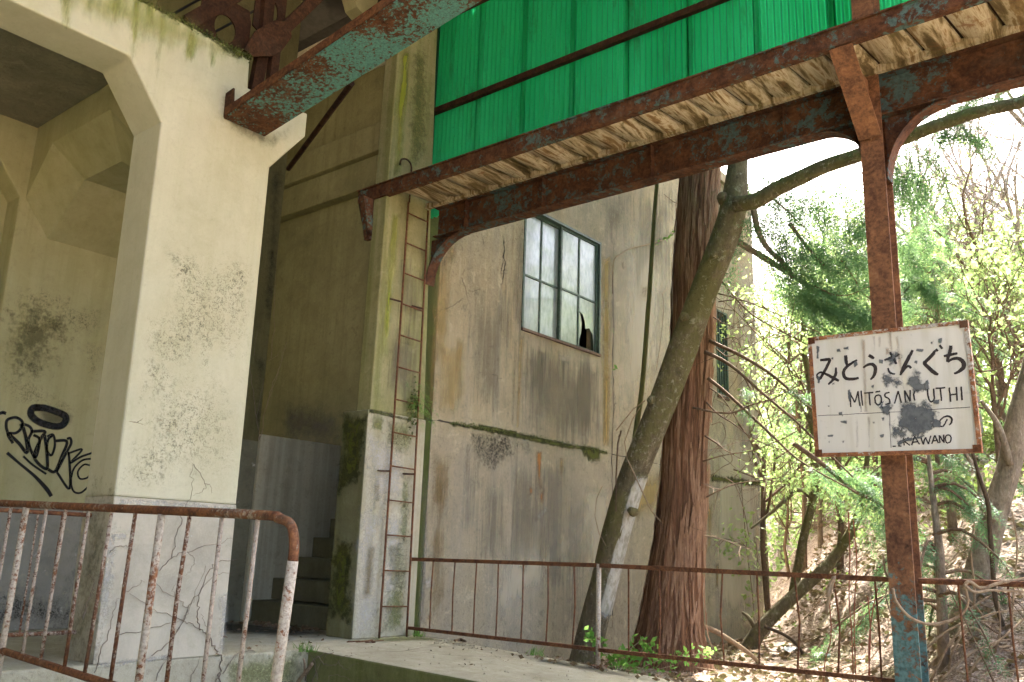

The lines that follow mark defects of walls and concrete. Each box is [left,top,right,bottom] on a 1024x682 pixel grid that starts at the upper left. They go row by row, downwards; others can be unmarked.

water stain [14,309,61,366]
water stain [473,434,529,468]
water stain [501,494,606,605]